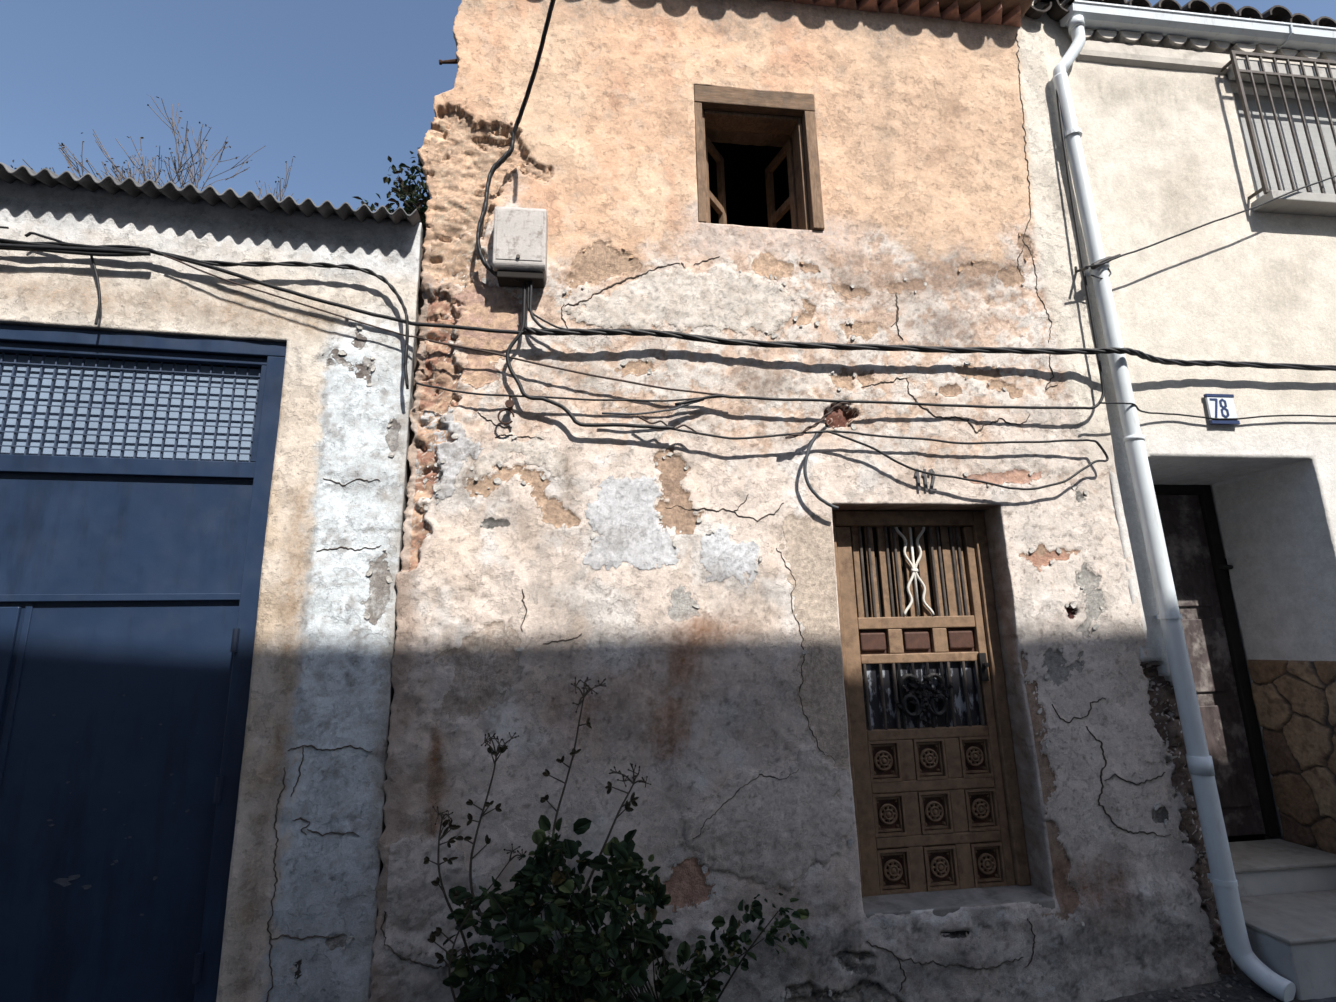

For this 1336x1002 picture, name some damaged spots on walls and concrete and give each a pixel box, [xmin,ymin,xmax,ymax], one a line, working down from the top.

peeling [322,314,376,387]
crack [561,256,720,328]
crack [861,34,1058,434]
crack [316,544,381,552]
peeling [360,549,393,625]
peeling [385,418,401,457]
peeling [409,106,851,780]
crack [665,494,783,522]
crack [266,745,372,1002]
flaking render [1019,543,1107,926]
crack [1052,697,1171,837]
flaking render [1140,662,1234,975]